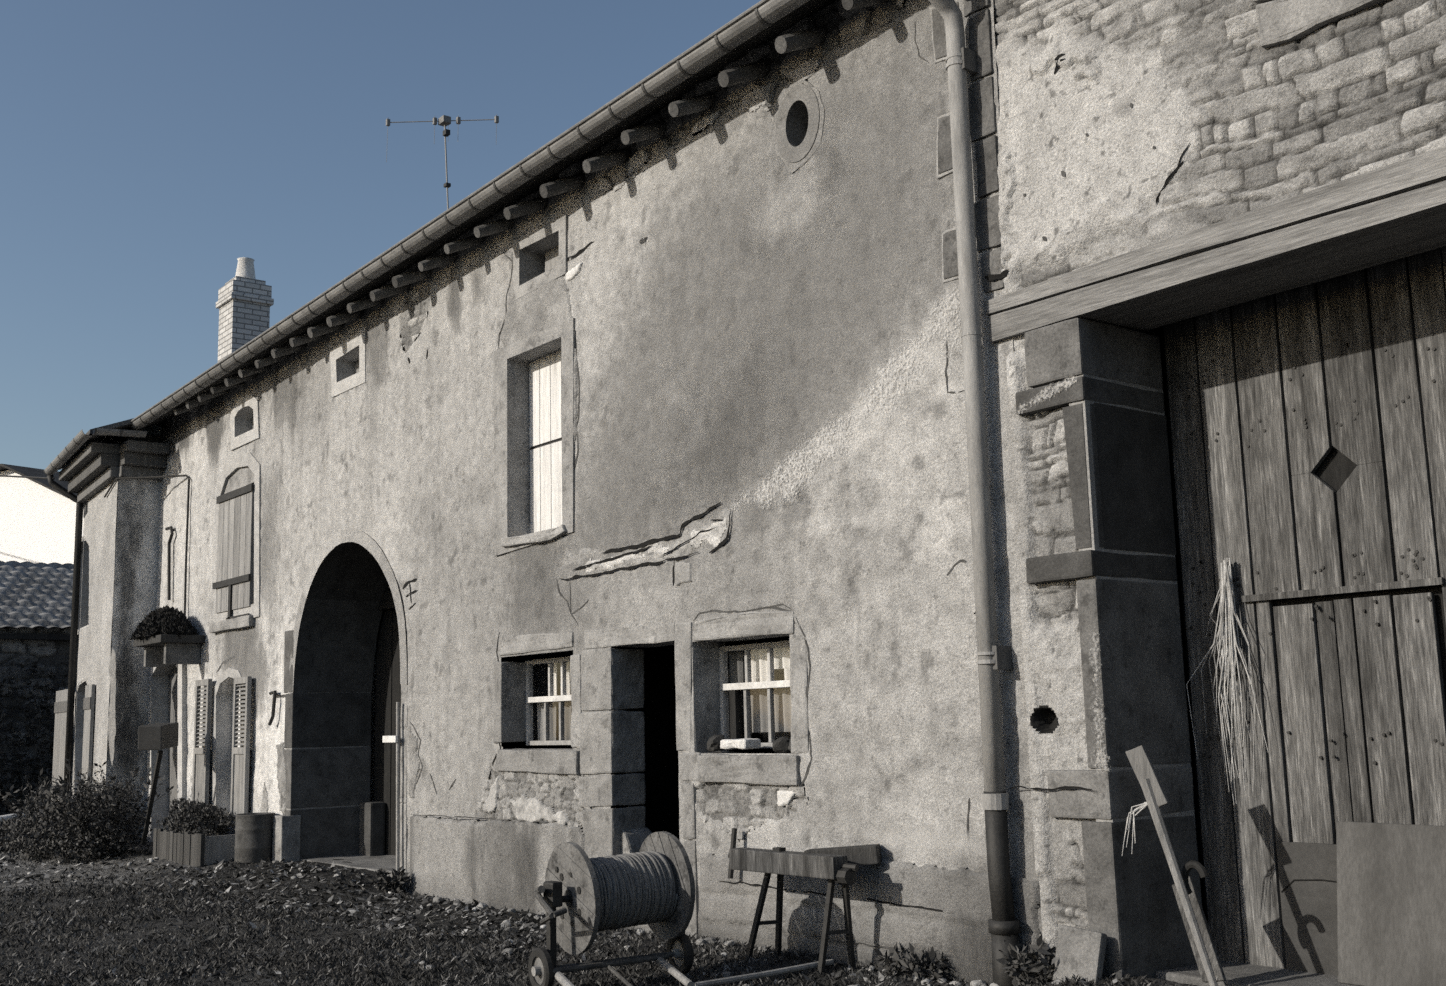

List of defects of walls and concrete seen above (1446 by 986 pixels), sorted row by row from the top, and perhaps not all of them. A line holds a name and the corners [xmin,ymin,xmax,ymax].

crack [1156,143,1190,203]
crack [565,241,594,281]
spalling [478,763,591,827]
spalling [692,781,807,841]